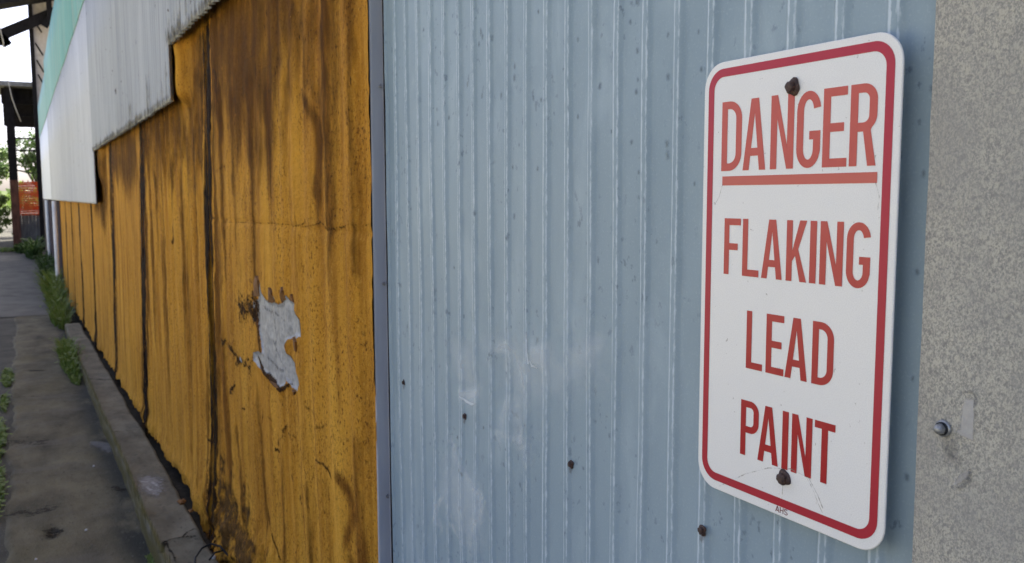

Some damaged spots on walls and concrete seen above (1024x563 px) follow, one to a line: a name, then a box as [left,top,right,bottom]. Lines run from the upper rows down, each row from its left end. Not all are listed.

leakage [95,0,304,278]
leakage [303,0,353,237]
peeling [252,275,301,395]